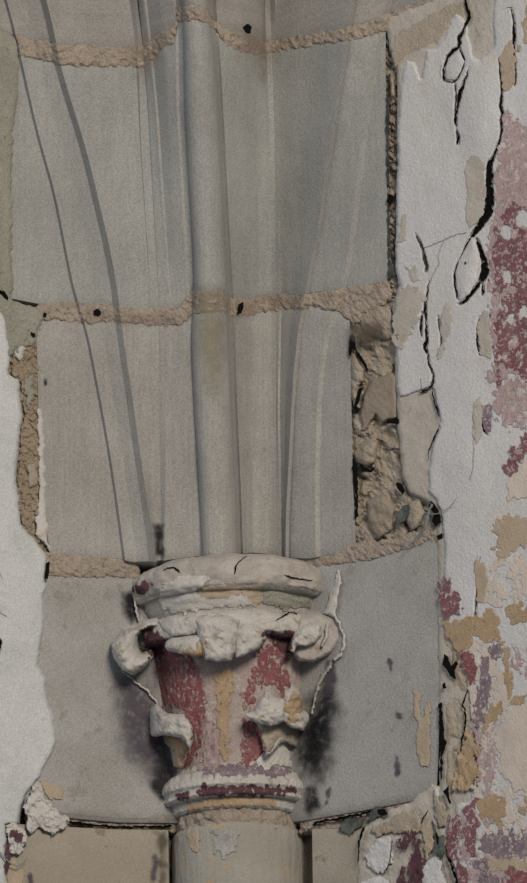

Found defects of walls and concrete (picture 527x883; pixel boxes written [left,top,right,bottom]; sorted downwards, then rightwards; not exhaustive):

spalling [350,1,464,543]
crack [416,0,517,459]
spalling [12,332,51,552]
peeling [132,575,323,616]
peeling [357,109,527,883]
peeling [140,628,304,813]
damp [306,787,331,813]
damp [301,660,337,774]